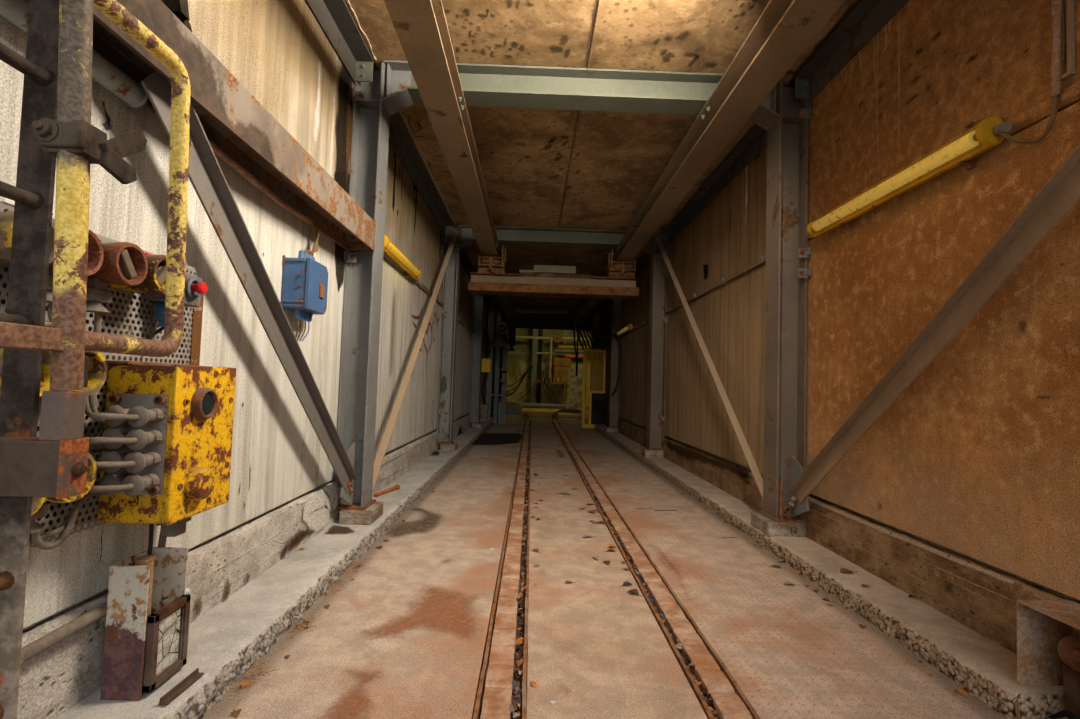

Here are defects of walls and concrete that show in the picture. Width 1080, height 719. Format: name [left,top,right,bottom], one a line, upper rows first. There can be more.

leakage [450,30,524,58]
leakage [551,35,569,57]
leakage [654,32,716,68]
leakage [328,55,352,194]
leakage [335,242,346,291]
rust [370,588,472,636]
rust [329,673,374,719]